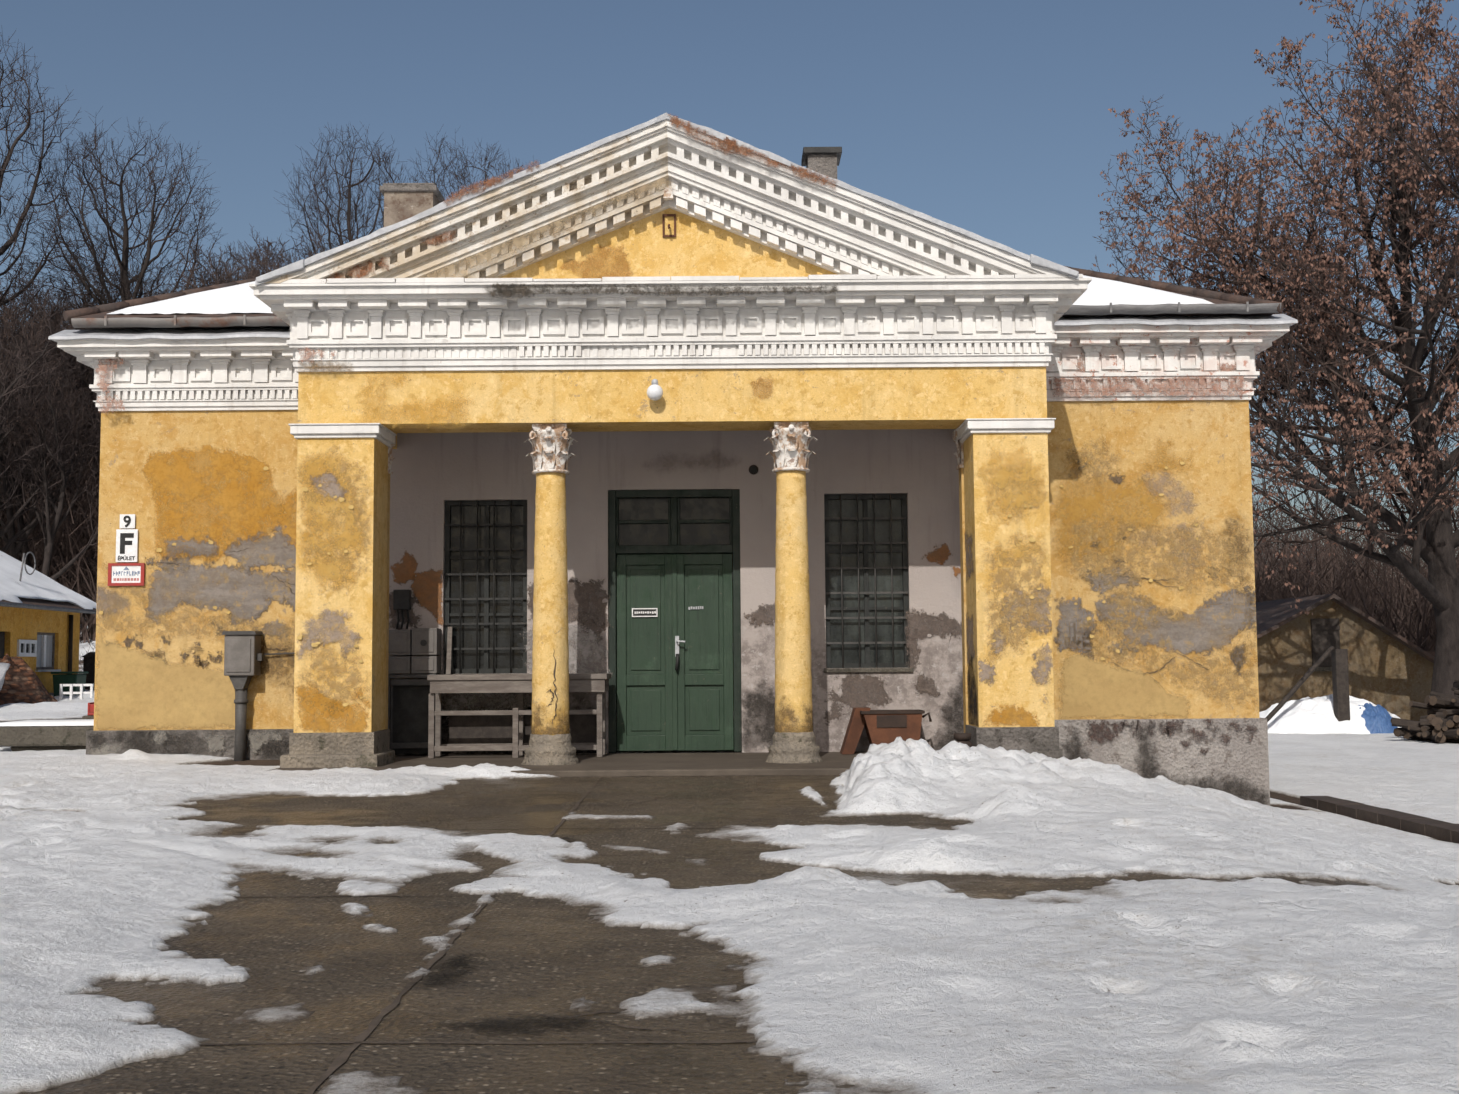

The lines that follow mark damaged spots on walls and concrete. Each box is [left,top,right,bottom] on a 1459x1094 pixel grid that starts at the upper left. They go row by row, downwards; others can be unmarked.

peeling [99,445,369,707]
peeling [389,550,443,630]
flaking render [524,582,534,671]
flaking render [567,579,610,673]
flaking render [744,603,775,627]
flaking render [904,445,1257,700]
water stain [743,687,775,746]
flaking render [1087,719,1258,757]